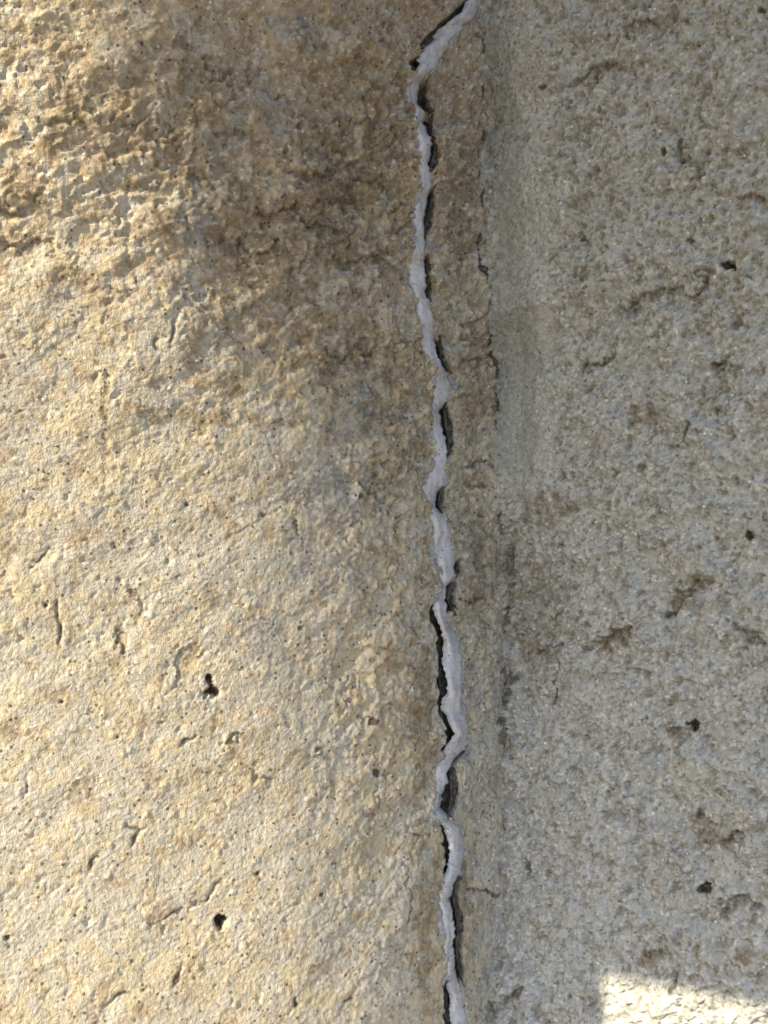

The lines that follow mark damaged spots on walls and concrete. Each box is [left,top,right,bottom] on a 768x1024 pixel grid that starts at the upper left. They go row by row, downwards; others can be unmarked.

crack [409,0,500,426]
crack [427,402,493,513]
crack [413,558,499,1024]